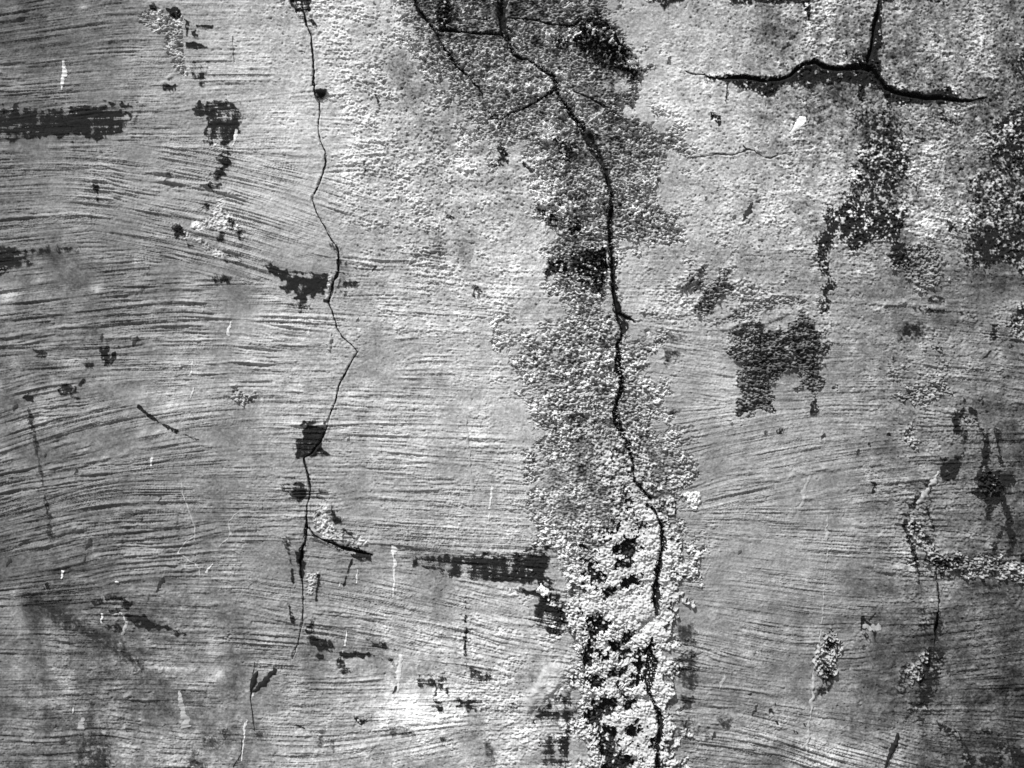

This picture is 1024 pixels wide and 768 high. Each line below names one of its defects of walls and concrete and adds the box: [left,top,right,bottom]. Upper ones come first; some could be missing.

leakage [550,12,642,83]
crack [686,0,988,103]
leakage [0,100,137,143]
leakage [192,99,244,211]
leakage [704,0,1000,314]
leakage [945,101,1024,277]
leakage [265,242,358,314]
leakage [295,420,330,459]
crack [292,1,373,659]
crack [413,0,667,768]
leakage [535,207,609,300]
leakage [405,393,732,768]